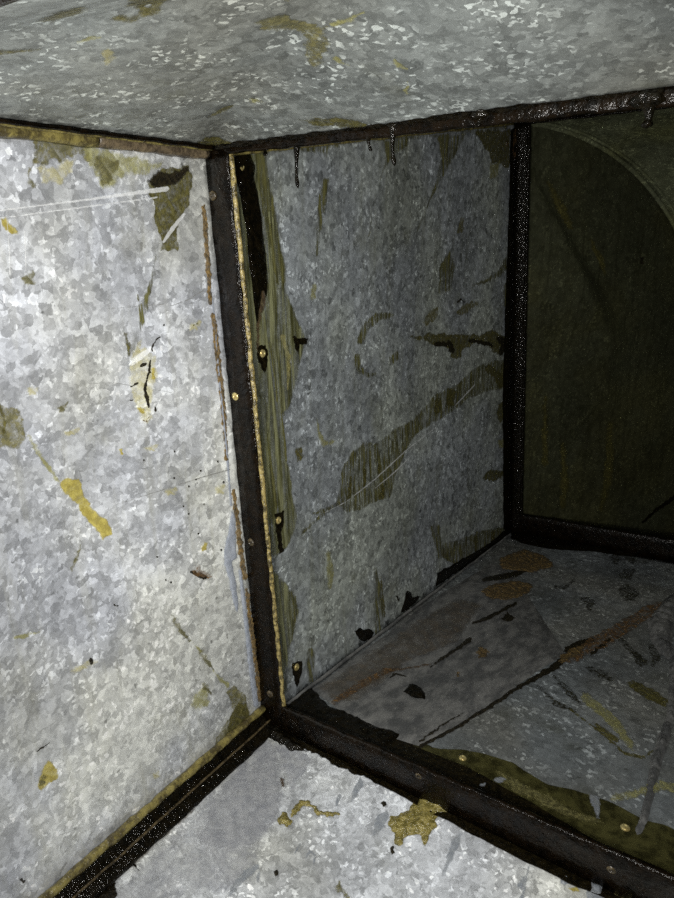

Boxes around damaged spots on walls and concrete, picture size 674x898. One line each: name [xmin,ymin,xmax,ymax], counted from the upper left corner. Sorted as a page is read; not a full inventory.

damp [149,167,189,188]
rust [201,204,229,461]
rust [231,489,261,702]